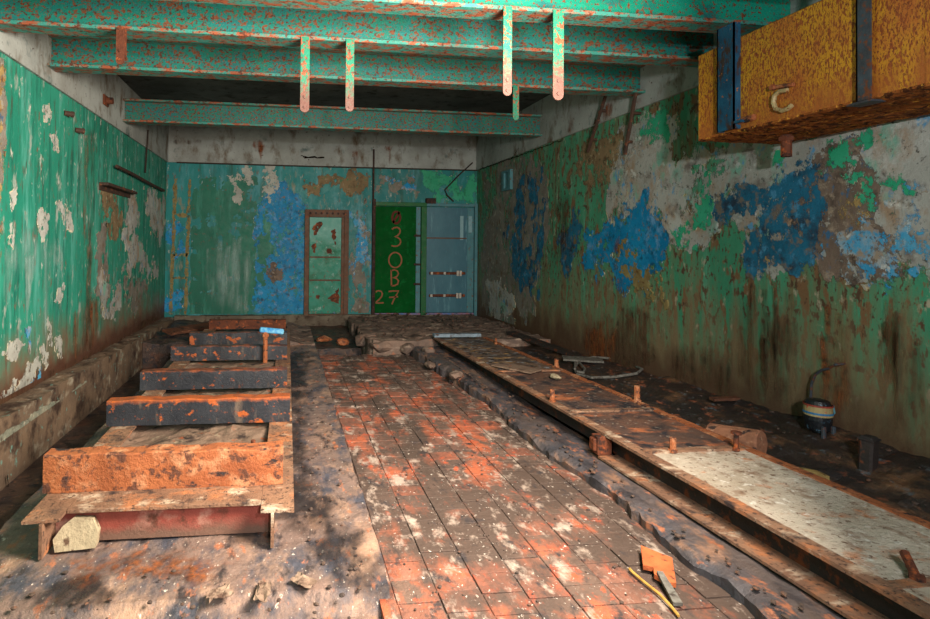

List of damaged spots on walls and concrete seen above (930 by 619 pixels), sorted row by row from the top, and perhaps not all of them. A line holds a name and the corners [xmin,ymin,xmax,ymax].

peeling [0,57,18,211]
peeling [42,103,59,153]
peeling [37,200,74,243]
peeling [54,282,66,304]
peeling [94,186,193,322]
peeling [227,165,280,287]
peeling [302,168,420,313]
peeling [616,238,669,310]
peeling [563,110,930,295]
peeling [0,315,63,399]